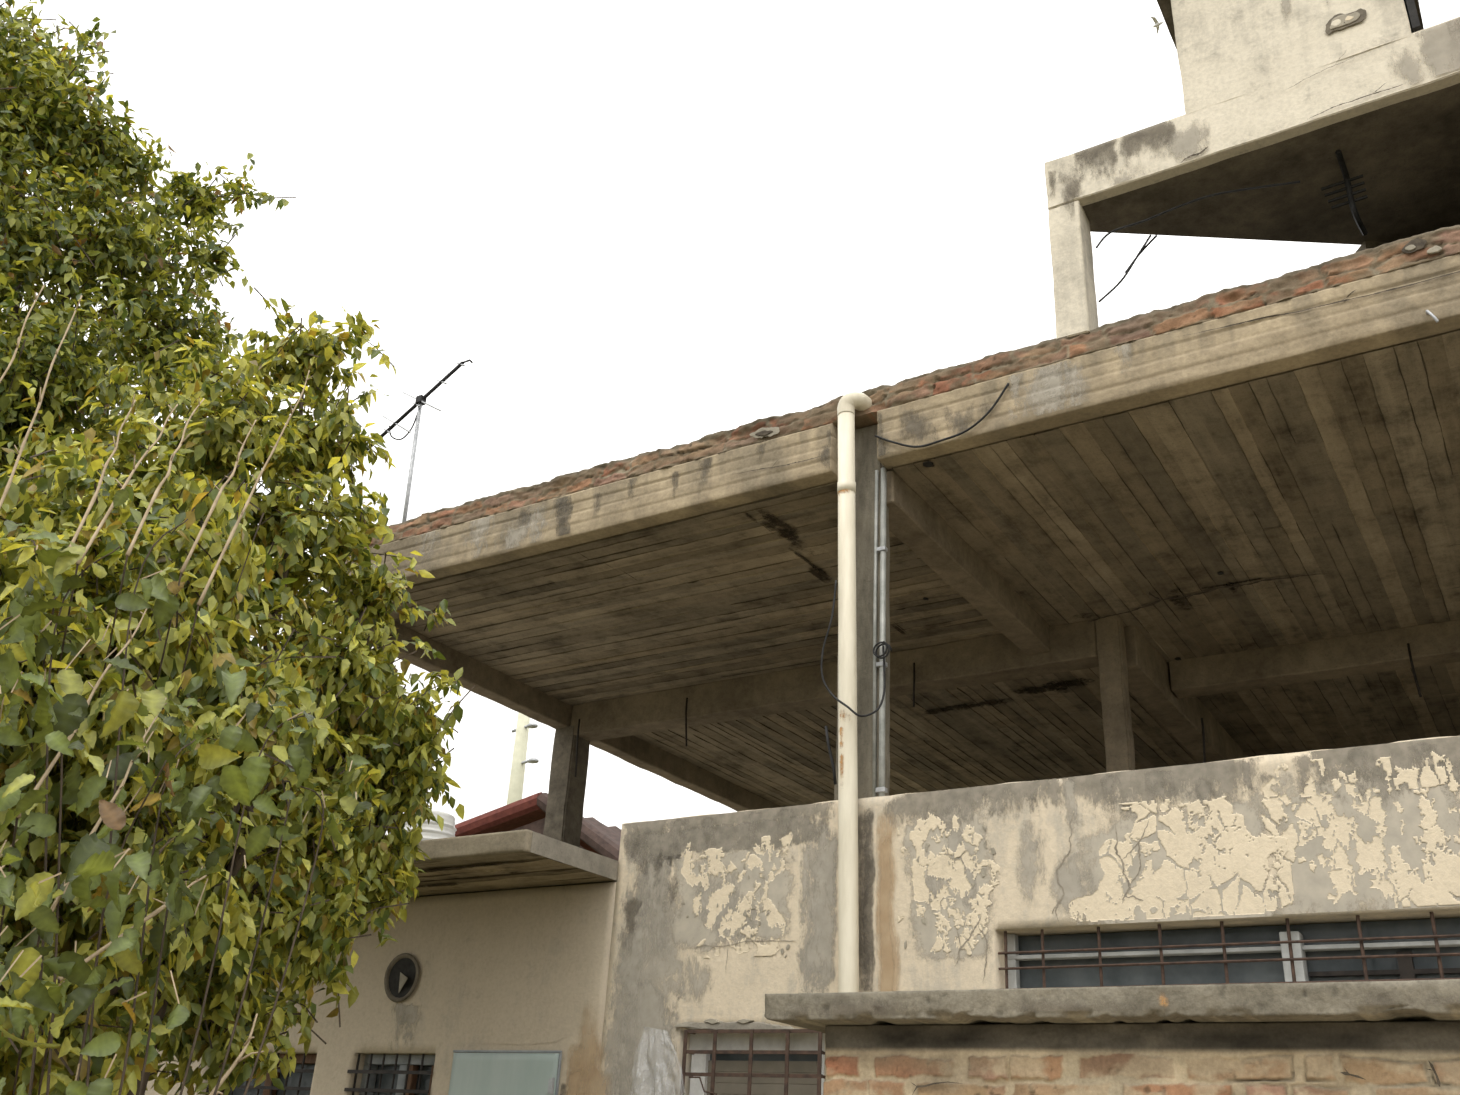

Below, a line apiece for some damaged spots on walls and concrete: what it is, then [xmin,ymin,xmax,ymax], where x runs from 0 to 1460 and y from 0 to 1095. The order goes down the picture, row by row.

crack [1090,573,1331,622]
water stain [560,802,838,1095]
peeling [670,832,794,959]
peeling [897,804,1000,960]
water stain [822,758,1271,1015]
peeling [1069,751,1460,925]